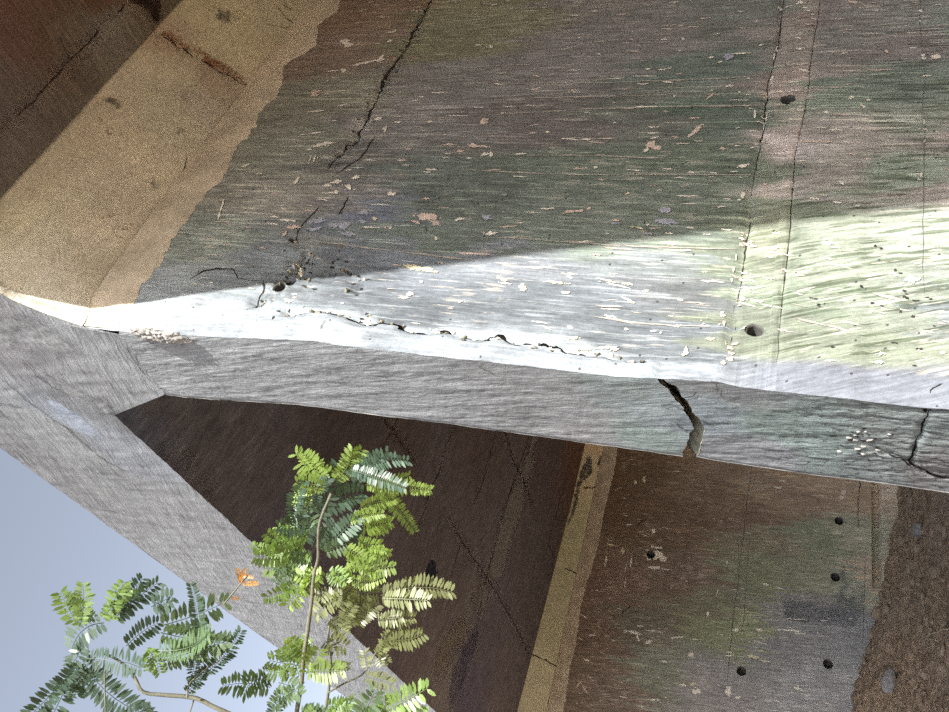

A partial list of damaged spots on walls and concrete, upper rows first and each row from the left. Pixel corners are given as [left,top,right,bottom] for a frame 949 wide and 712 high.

crack [0,3,125,130]
rust [162,33,238,77]
crack [164,36,247,85]
crack [327,0,432,175]
crack [295,197,348,241]
crack [293,311,639,362]
crack [657,378,718,455]
crack [888,383,949,478]
water stain [426,560,437,587]